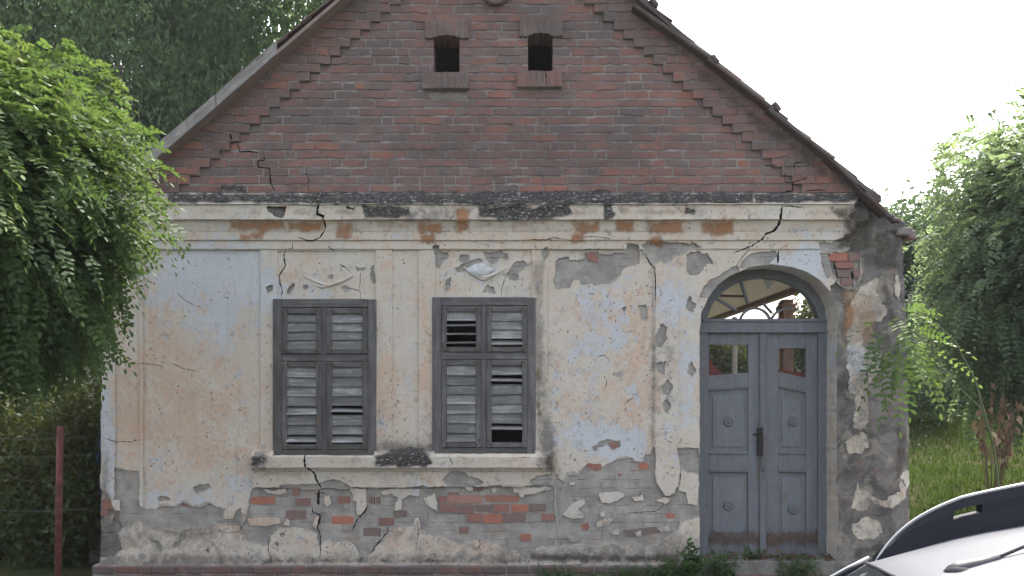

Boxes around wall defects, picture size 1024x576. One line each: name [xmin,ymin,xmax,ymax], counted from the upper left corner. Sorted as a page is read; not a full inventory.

crack [230,134,275,191]
crack [279,171,361,299]
flaking render [541,241,777,313]
crack [732,162,822,263]
flaking render [654,323,667,348]
flaking render [656,361,673,414]
flaking render [819,200,916,563]
crack [303,455,325,556]
flaking render [100,438,699,561]